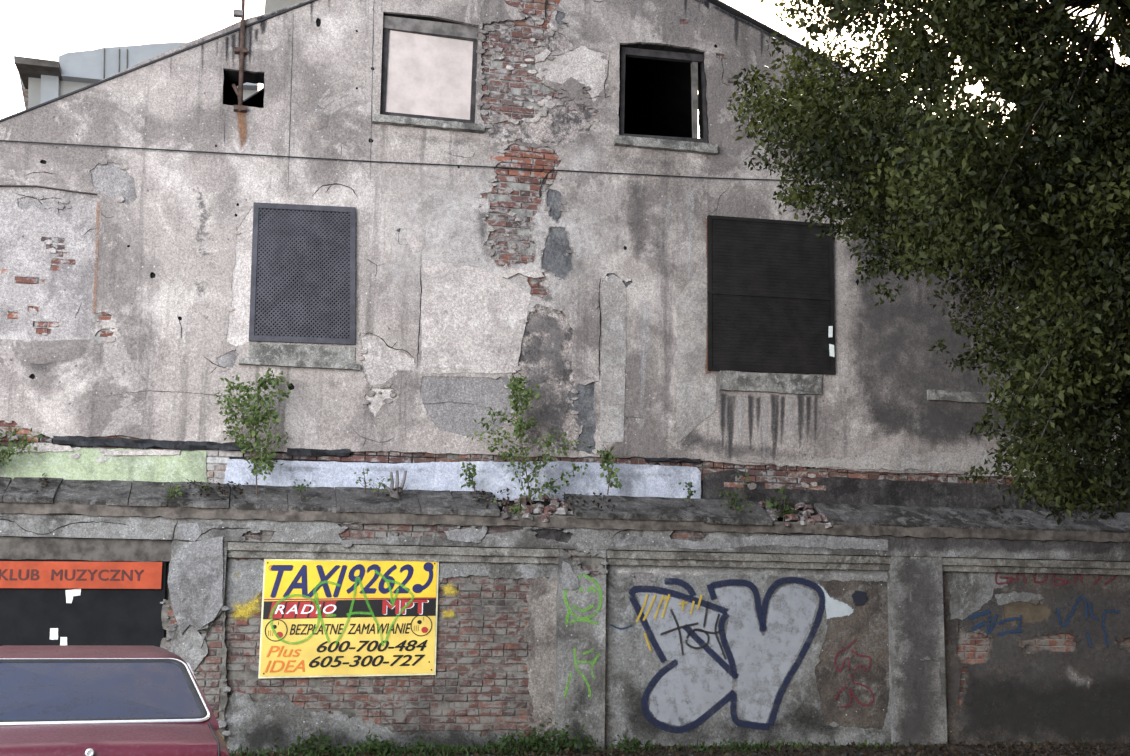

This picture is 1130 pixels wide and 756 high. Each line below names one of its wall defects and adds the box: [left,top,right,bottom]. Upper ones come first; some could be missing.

corrosion [237,112,247,146]
flaking render [0,0,1029,491]
damp [686,394,817,457]
flaking render [160,523,890,754]
flaking render [948,571,1080,706]